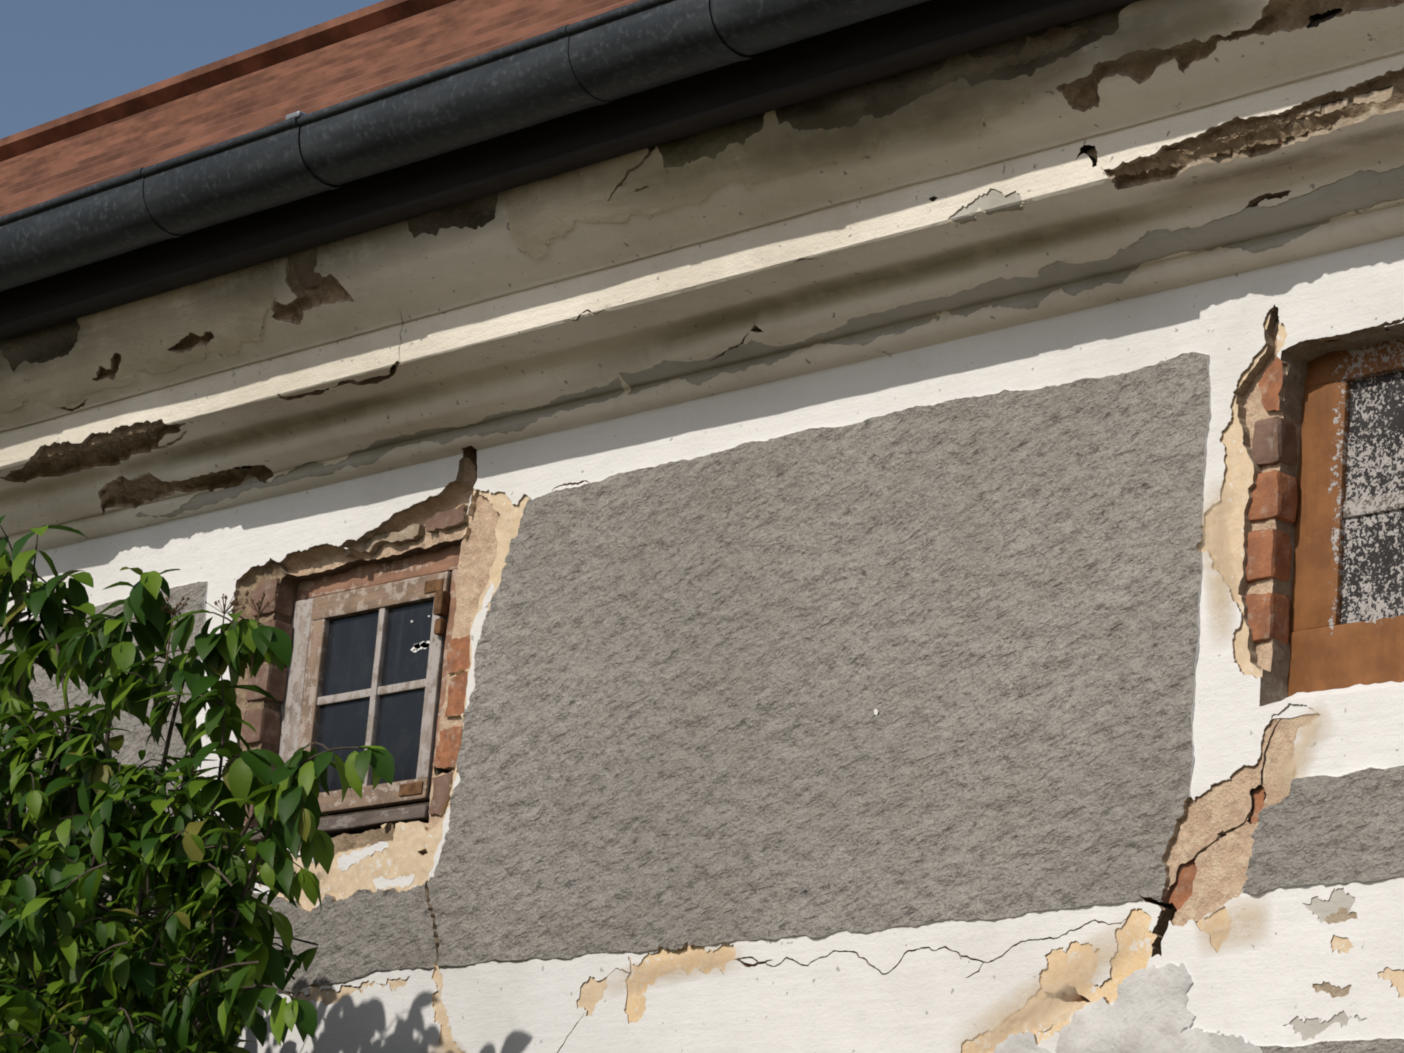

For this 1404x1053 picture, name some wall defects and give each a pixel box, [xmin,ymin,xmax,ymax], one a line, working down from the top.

peeling [505,0,1404,260]
peeling [0,166,1404,913]
crack [424,881,440,961]
crack [735,718,1283,978]
peeling [961,703,1321,1053]
peeling [1303,888,1358,954]
peeling [431,962,465,1053]
peeling [557,976,608,1053]
peeling [624,942,736,1024]
damp [987,950,1111,1037]
peeling [1283,981,1367,1041]
peeling [1378,967,1404,998]